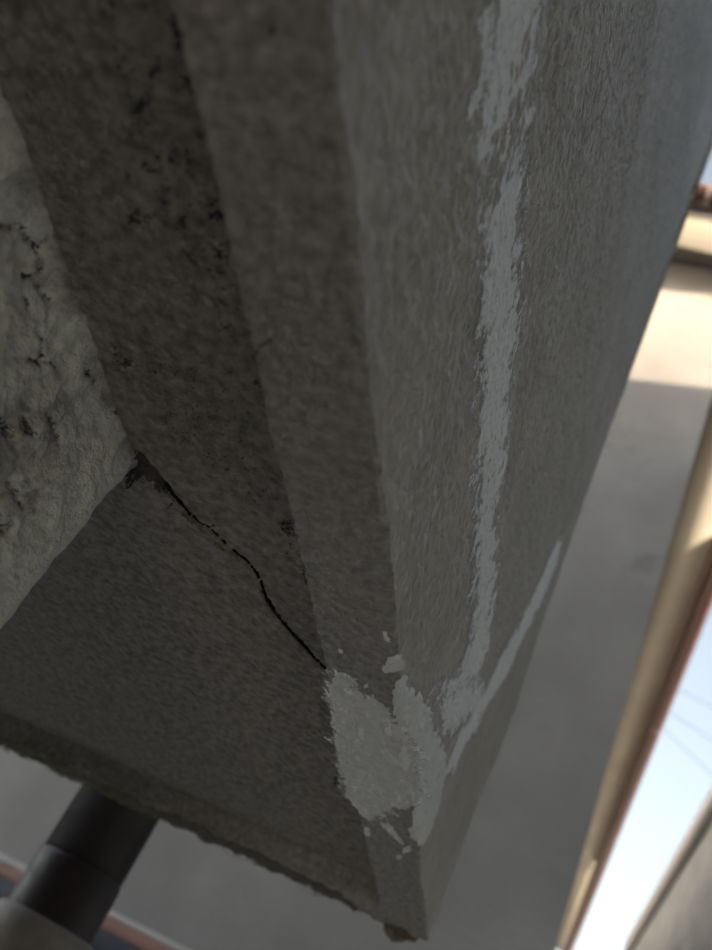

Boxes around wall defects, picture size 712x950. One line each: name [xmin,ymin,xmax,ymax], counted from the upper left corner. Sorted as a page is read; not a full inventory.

crack [162,483,326,670]
peeling [321,654,447,859]